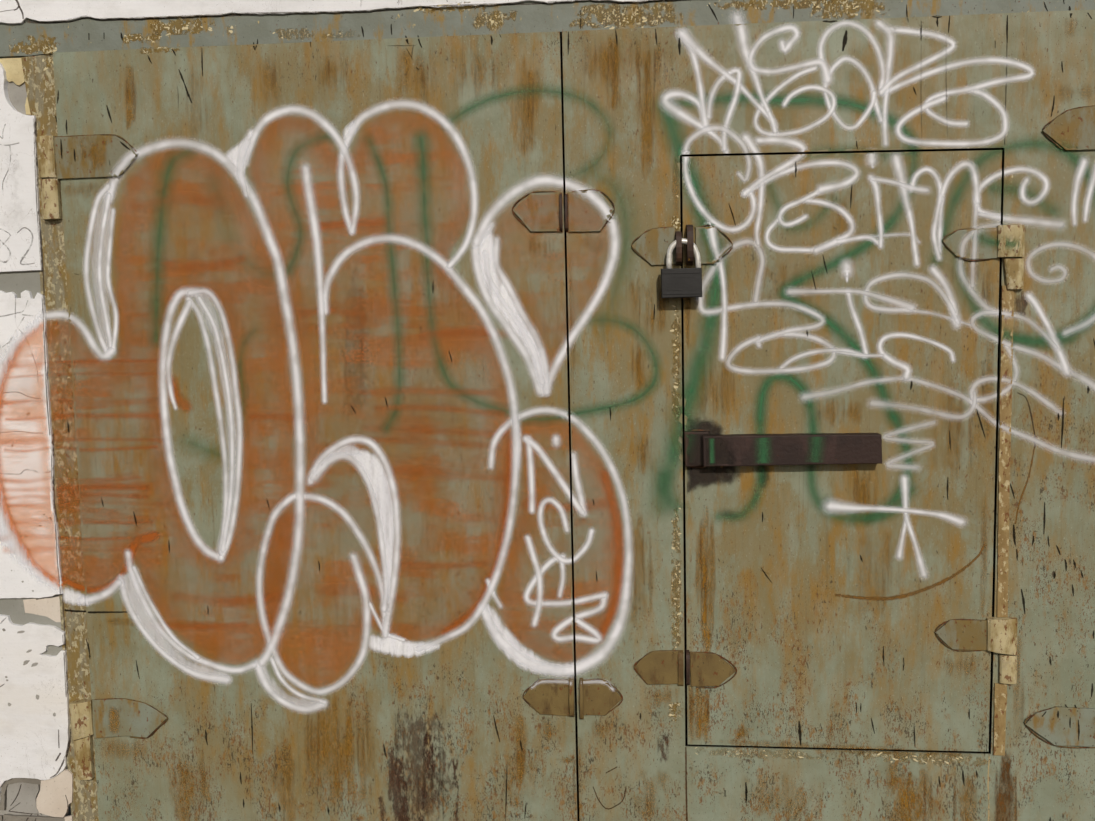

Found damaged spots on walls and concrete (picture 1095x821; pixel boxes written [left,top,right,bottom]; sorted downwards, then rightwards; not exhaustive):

flaking render [0,35,57,116]
flaking render [0,581,61,633]
rust [697,527,713,652]
rust [835,544,985,601]
flaking render [23,645,62,667]
flaking render [0,769,73,821]
rust [379,733,435,821]
rust [996,753,1013,821]